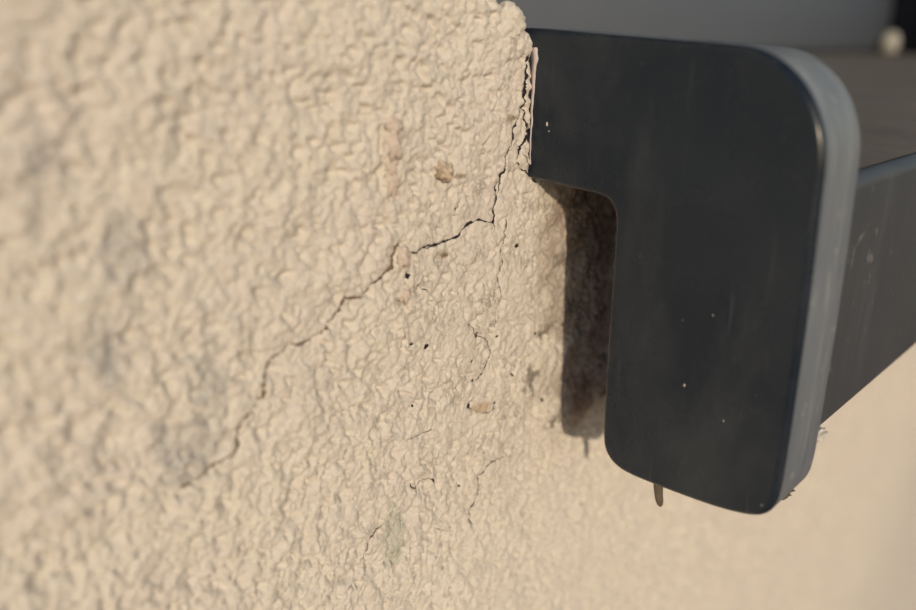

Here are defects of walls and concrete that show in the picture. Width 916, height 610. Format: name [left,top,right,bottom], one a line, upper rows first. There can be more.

crack [180,55,537,489]
crack [468,456,508,527]